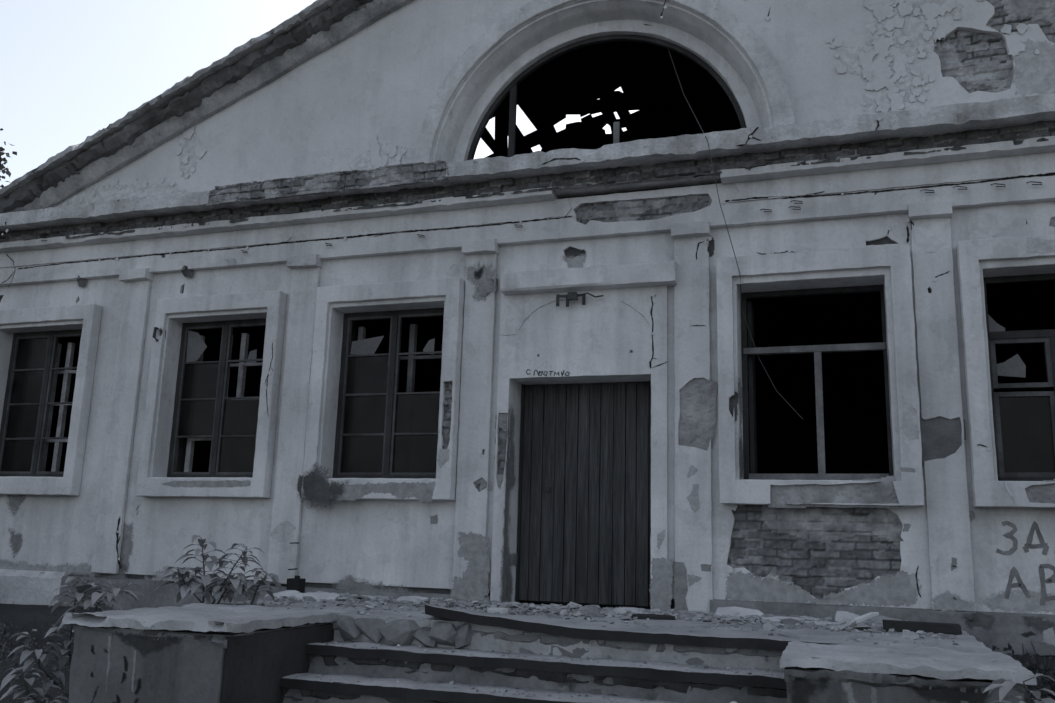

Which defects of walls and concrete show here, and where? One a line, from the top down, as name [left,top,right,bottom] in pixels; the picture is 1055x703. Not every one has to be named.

spalling [825,0,1055,112]
spalling [0,121,1055,243]
spalling [564,247,586,258]
spalling [866,237,897,246]
crack [621,293,668,368]
spalling [437,382,456,468]
spalling [679,378,717,451]
spalling [729,392,738,422]
spalling [920,412,966,465]
peeling [331,482,435,503]
peeling [449,531,491,601]
spalling [725,476,922,607]